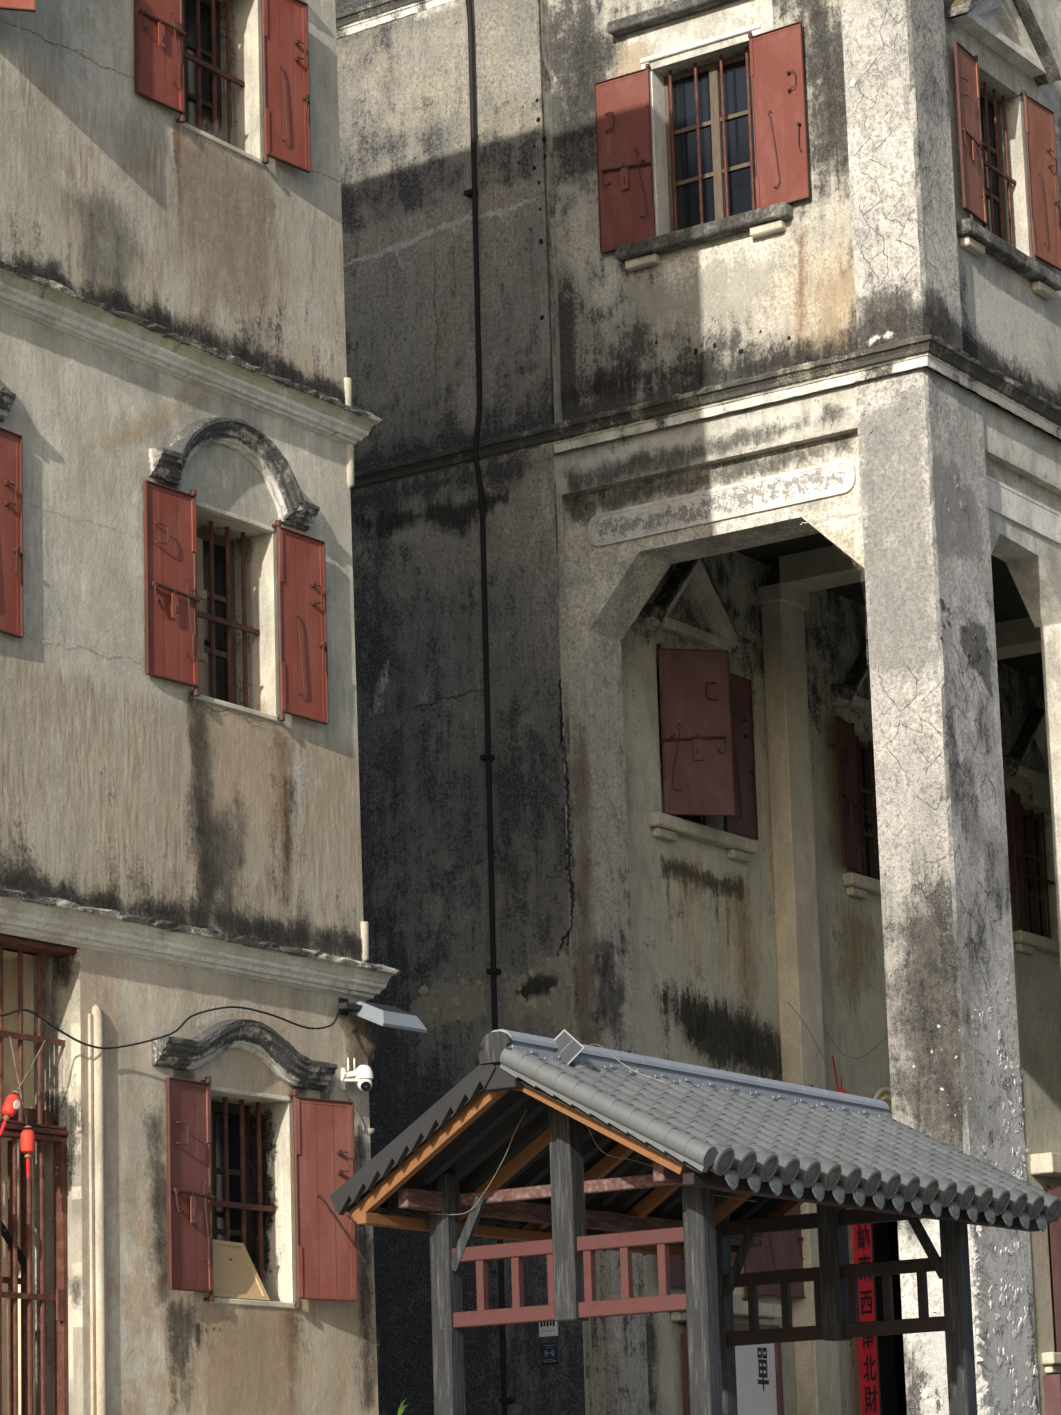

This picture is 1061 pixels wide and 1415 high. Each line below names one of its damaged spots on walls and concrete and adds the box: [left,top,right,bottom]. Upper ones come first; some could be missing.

crack [1,19,133,79]
water stain [8,135,346,405]
peeling [592,466,845,540]
water stain [0,690,363,961]
water stain [658,986,782,1081]